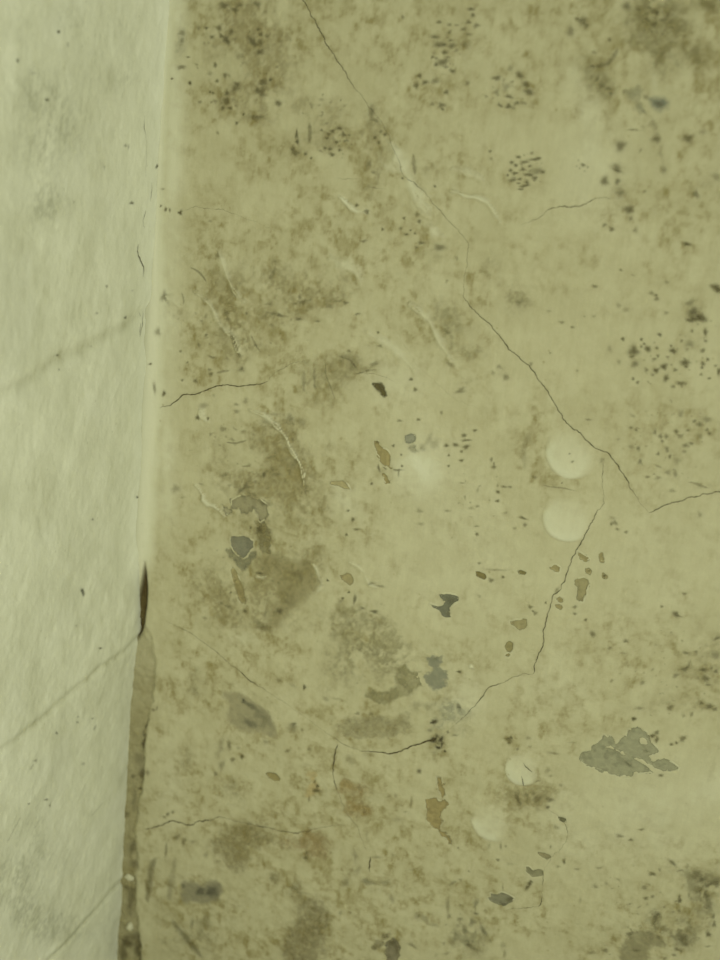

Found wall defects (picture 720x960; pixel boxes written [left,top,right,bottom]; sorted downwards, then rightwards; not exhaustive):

crack [303,1,348,78]
crack [171,382,265,405]
crack [468,303,633,491]
peeling [371,441,394,484]
peeling [192,480,271,604]
peeling [429,592,458,617]
crack [533,512,597,674]
peeling [370,649,454,703]
crack [370,738,437,754]
peeling [579,718,681,779]
peeling [425,777,452,844]